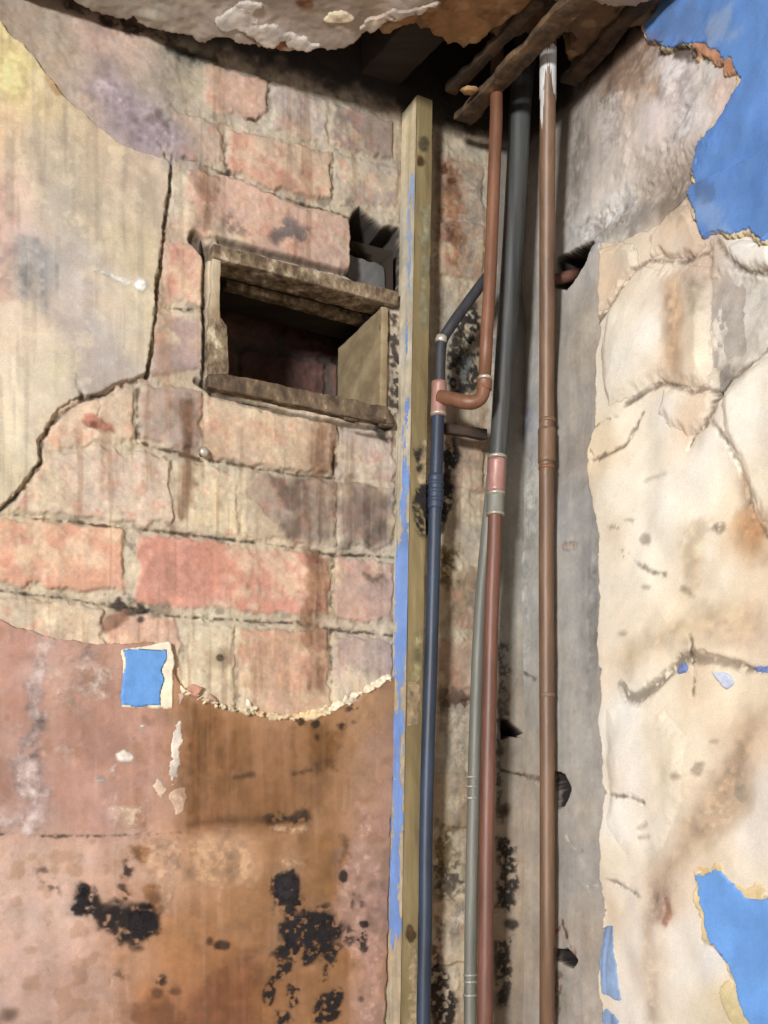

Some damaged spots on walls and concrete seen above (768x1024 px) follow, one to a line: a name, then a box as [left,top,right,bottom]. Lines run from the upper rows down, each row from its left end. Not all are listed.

peeling [215,0,321,52]
peeling [641,0,768,246]
crack [272,193,347,218]
crack [0,153,191,511]
leakage [447,302,480,393]
crack [137,433,336,479]
crack [599,384,700,459]
peeling [120,642,219,709]
leakage [71,847,162,945]
leakage [262,860,368,1024]
leakage [494,836,519,1005]
peeling [693,863,768,1024]